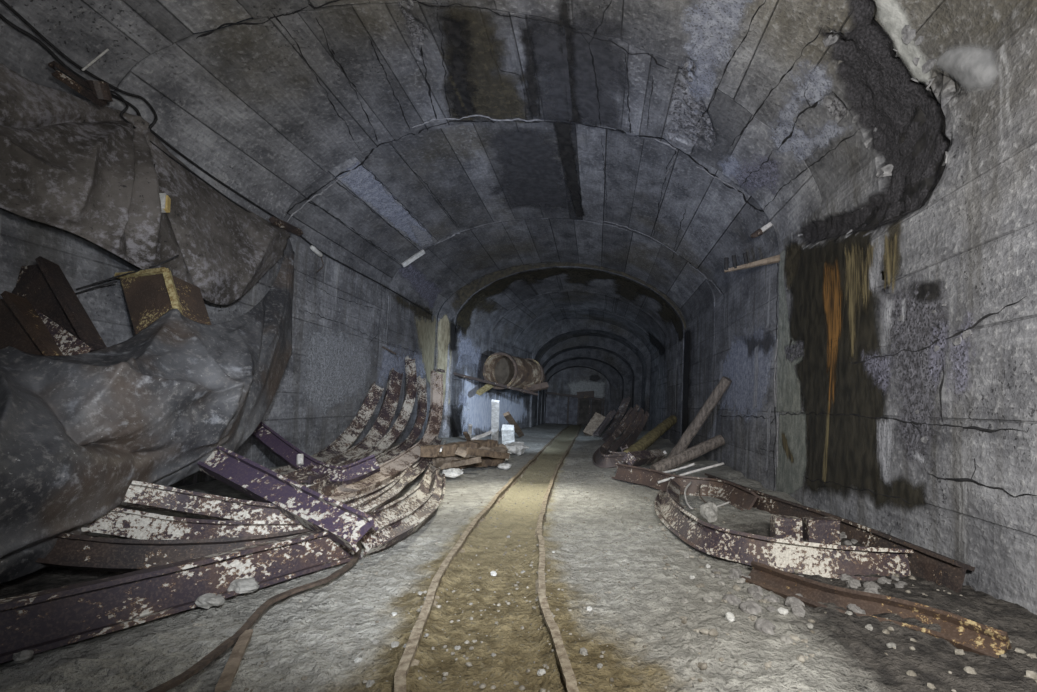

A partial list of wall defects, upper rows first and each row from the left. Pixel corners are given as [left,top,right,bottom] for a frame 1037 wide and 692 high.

leakage [440,0,630,217]
crack [196,0,876,376]
spalling [797,0,967,244]
leakage [711,222,926,509]
corrosion [822,233,897,482]
crack [723,263,1026,491]
crack [931,458,1037,497]